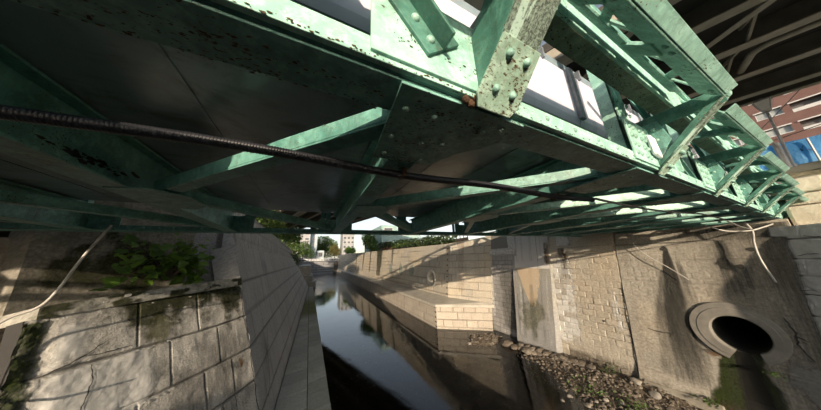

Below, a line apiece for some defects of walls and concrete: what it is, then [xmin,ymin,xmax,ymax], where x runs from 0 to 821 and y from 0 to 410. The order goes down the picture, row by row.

corrosion [286,17,470,95]
peeling [490,236,550,307]
leakage [692,222,782,276]
crack [34,338,131,410]
leakage [658,249,701,368]
leakage [735,351,779,410]
crack [784,318,815,362]